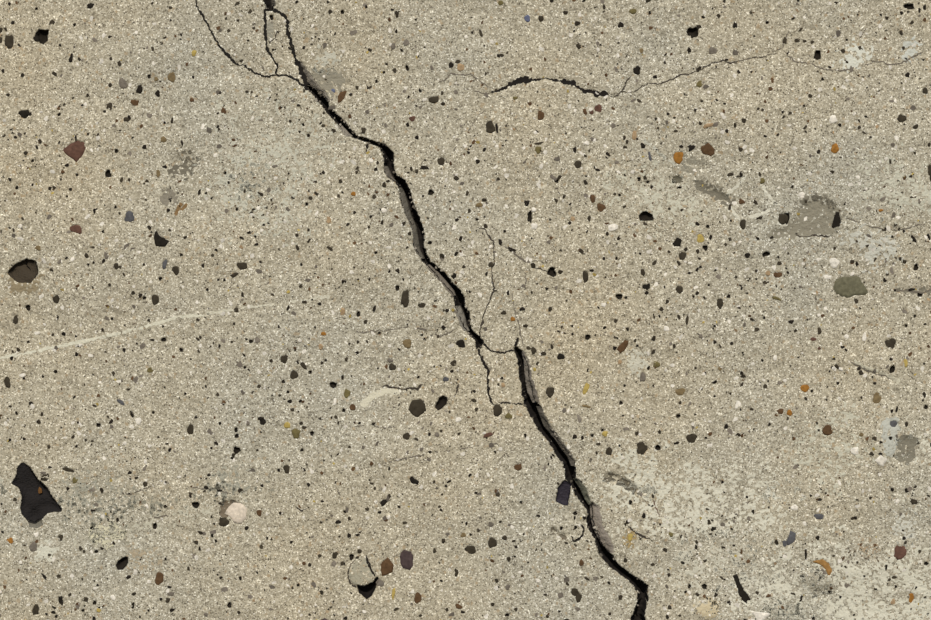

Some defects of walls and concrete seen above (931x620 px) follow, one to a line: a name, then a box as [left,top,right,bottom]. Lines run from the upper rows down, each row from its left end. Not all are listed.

crack [195,0,648,620]